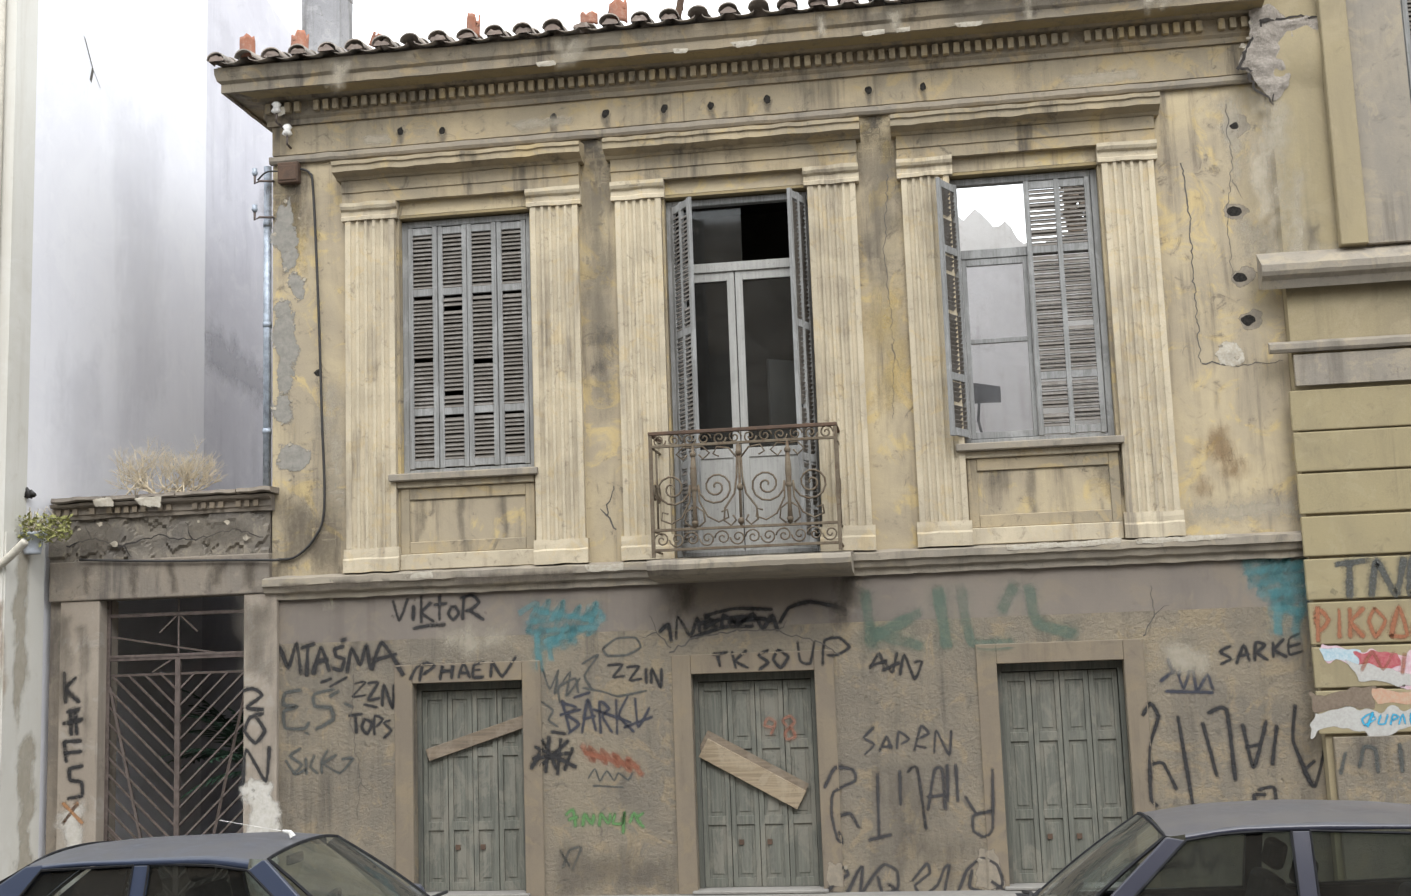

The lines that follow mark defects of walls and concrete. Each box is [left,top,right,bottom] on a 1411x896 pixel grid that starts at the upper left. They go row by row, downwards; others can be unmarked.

spalling [1239,4,1319,101]
crack [1225,14,1317,275]
spalling [1224,204,1250,220]
crack [1180,163,1283,367]
spalling [1232,266,1256,288]
peeling [270,197,307,425]
spalling [1215,309,1262,367]
peeling [276,442,311,481]
crack [601,486,616,530]
crack [66,522,263,557]
peeling [241,778,281,833]